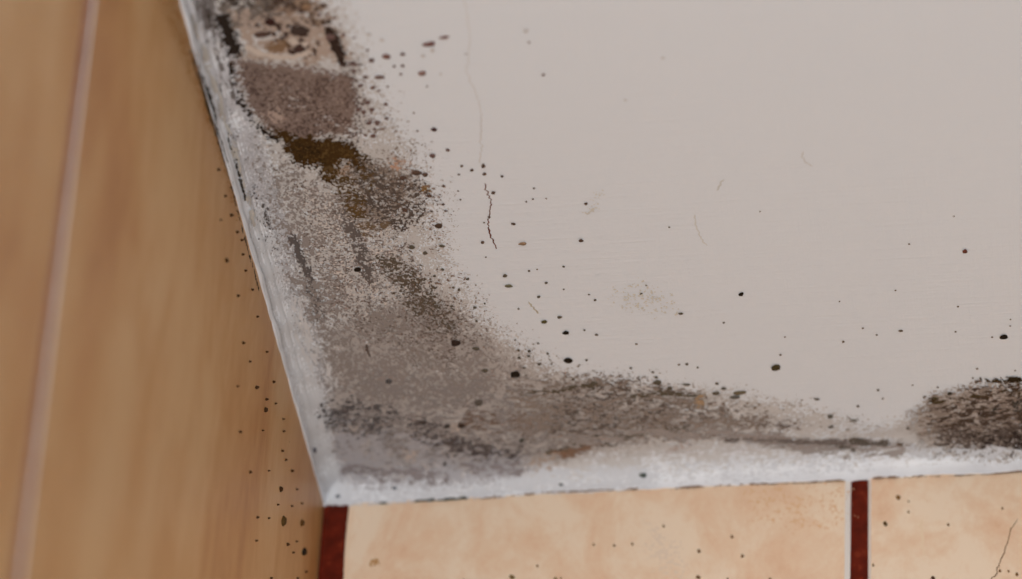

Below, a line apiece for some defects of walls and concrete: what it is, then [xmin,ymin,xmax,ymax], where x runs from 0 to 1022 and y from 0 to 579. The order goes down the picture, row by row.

water stain [156,0,1022,541]
crack [991,521,1017,579]